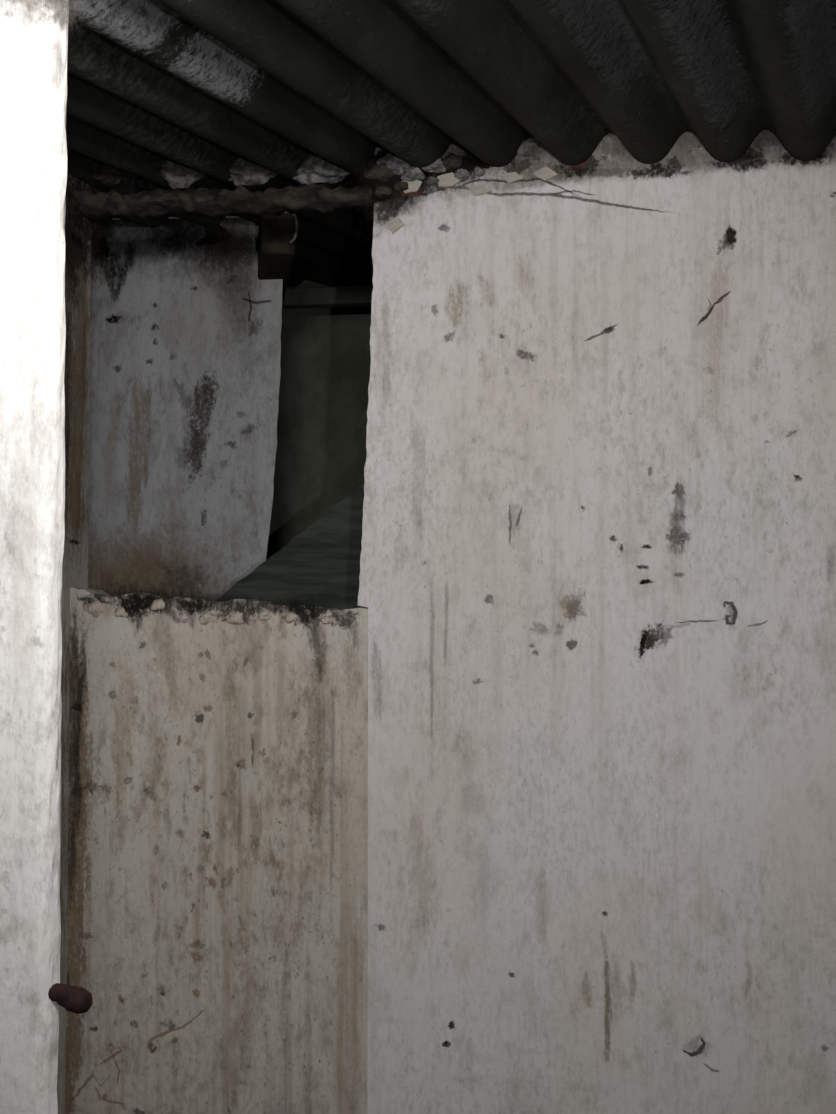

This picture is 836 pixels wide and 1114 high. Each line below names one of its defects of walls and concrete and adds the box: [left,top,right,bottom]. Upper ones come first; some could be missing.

water stain [189,377,218,478]